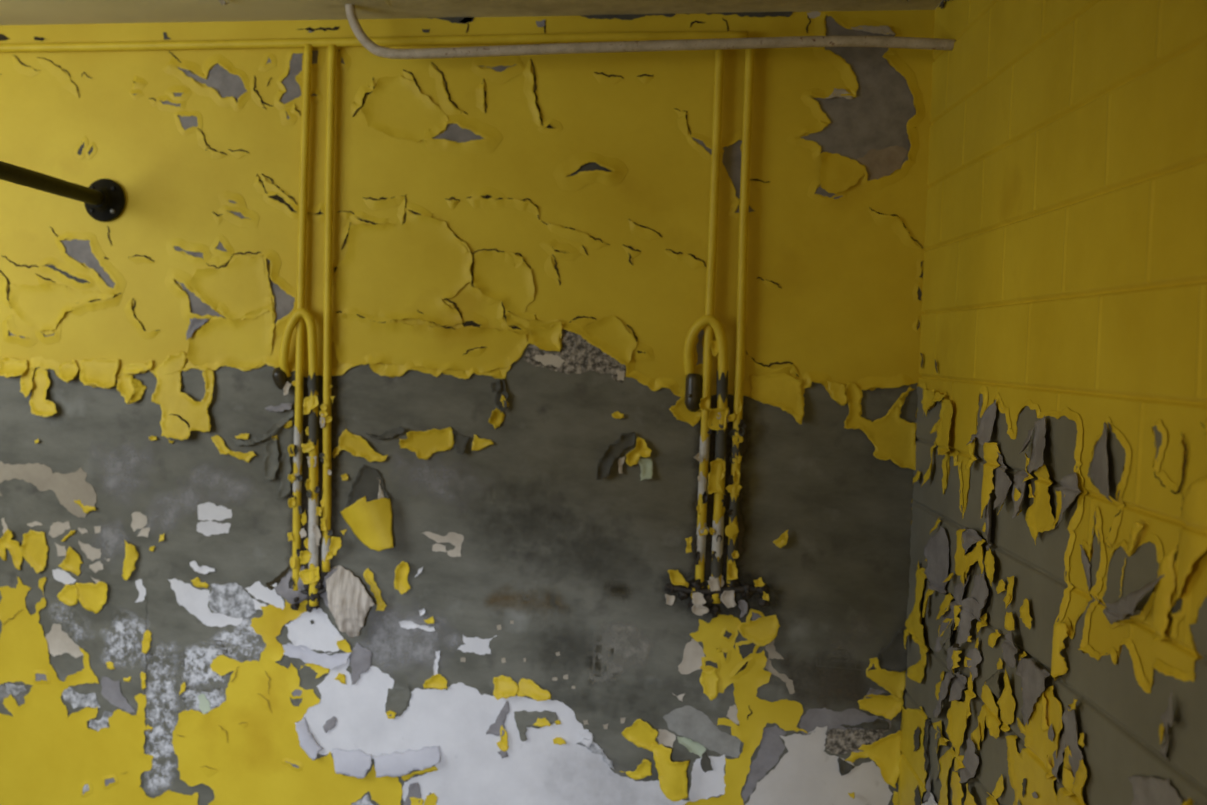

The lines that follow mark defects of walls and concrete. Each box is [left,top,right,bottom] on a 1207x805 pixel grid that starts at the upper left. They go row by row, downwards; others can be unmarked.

peeling [422,17,474,33]
peeling [128,32,351,152]
crack [350,62,487,142]
crack [523,59,563,134]
crack [593,72,654,86]
peeling [580,11,925,219]
crack [206,147,707,373]
crack [744,351,799,377]
peeling [0,191,1207,805]